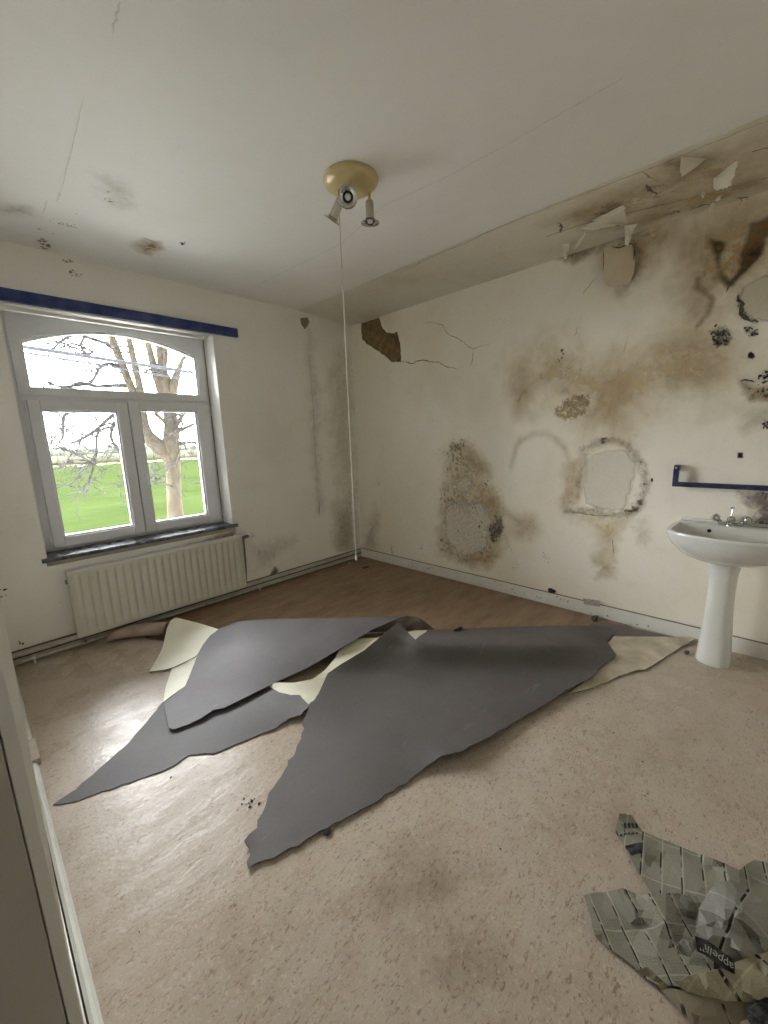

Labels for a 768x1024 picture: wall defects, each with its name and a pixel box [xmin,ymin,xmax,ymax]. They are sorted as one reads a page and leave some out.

peeling [680,156,706,176]
peeling [701,161,738,213]
peeling [562,205,637,259]
flaking render [360,317,402,363]
crack [400,322,489,369]
mould [710,324,731,348]
water stain [550,349,643,420]
mould [741,370,768,400]